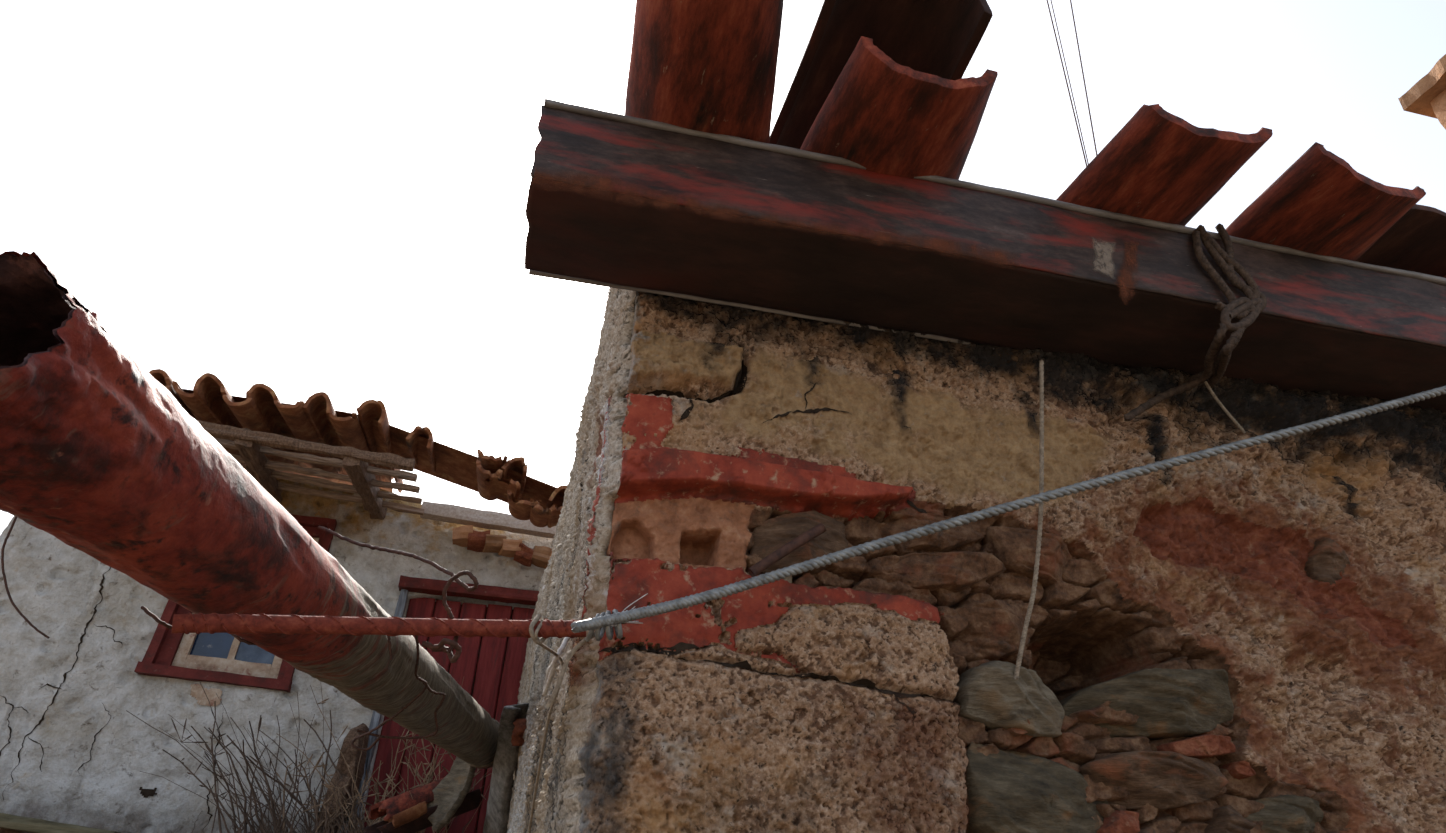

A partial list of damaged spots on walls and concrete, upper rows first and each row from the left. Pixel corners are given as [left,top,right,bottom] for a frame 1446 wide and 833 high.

crack [0,567,122,800]
spalling [171,393,1351,833]
crack [598,642,959,726]
spalling [1133,496,1419,648]